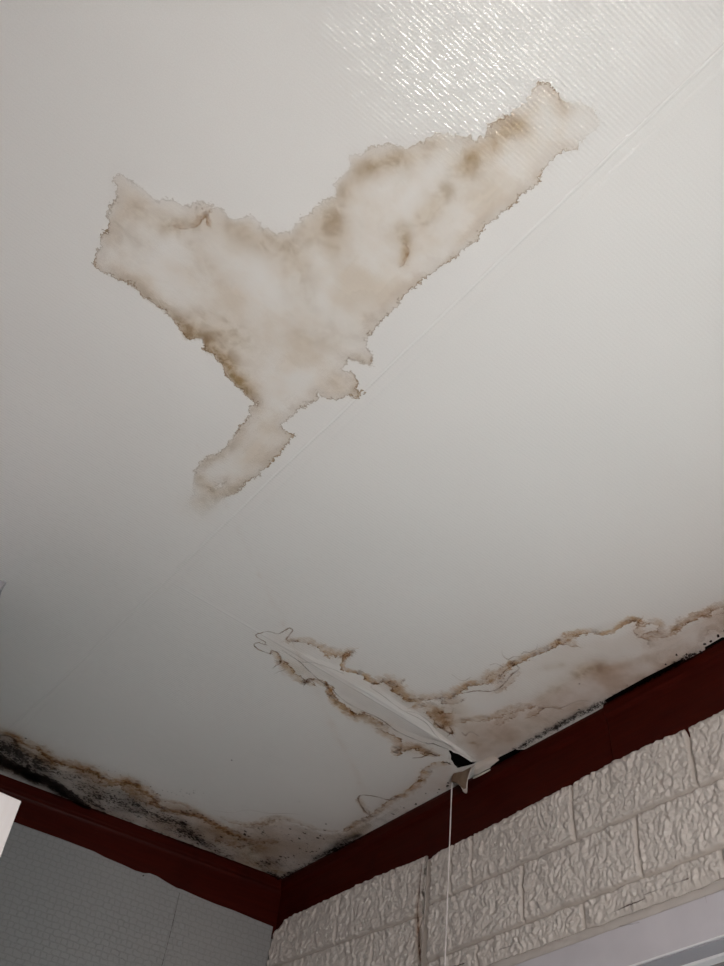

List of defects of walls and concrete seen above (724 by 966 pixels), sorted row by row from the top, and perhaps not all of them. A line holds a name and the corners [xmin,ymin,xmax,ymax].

leakage [254,646,443,822]
leakage [505,634,720,756]
leakage [0,736,371,880]